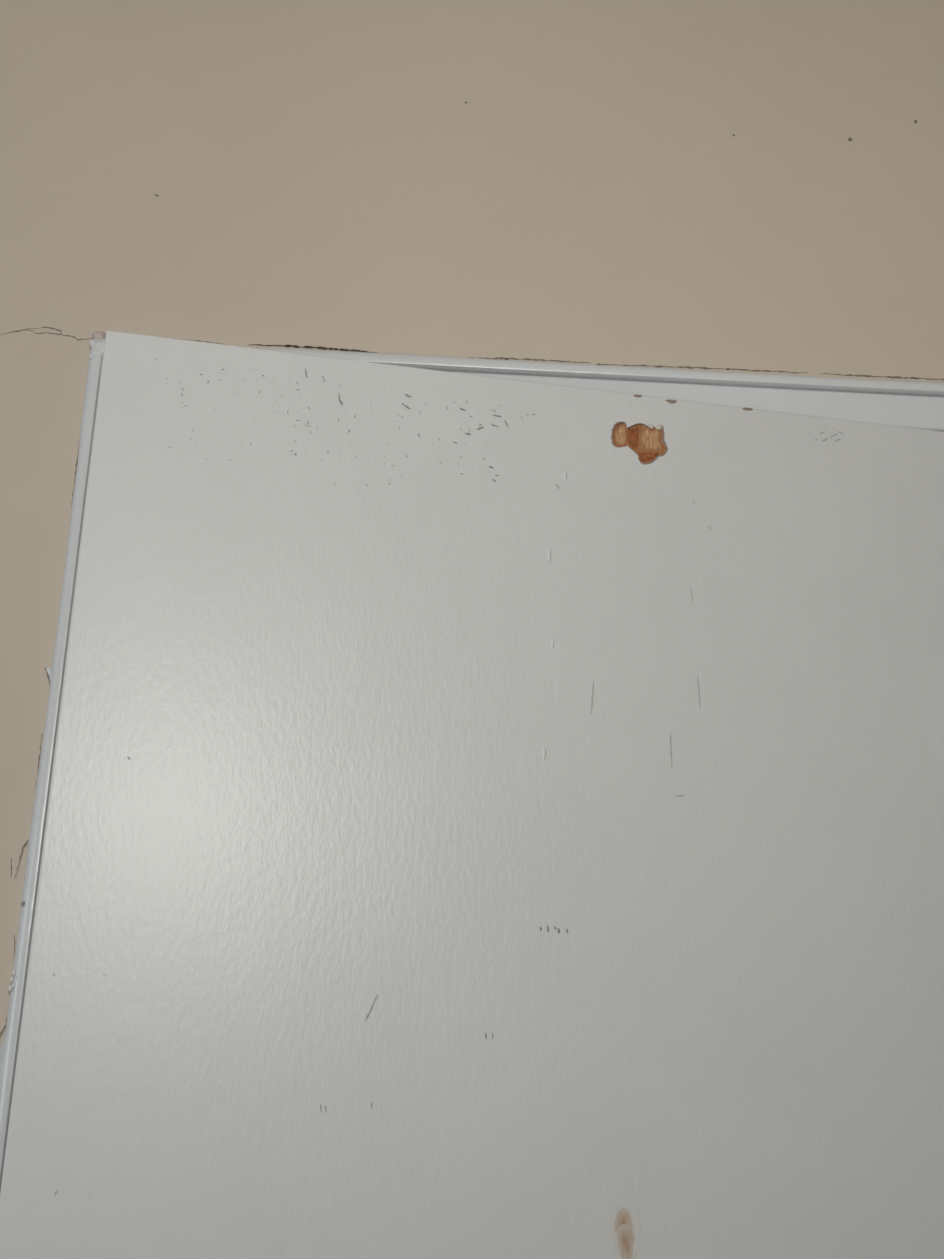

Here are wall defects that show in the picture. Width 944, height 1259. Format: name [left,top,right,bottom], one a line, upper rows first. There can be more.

crack [1,327,93,341]
crack [253,344,377,353]
crack [469,357,944,380]